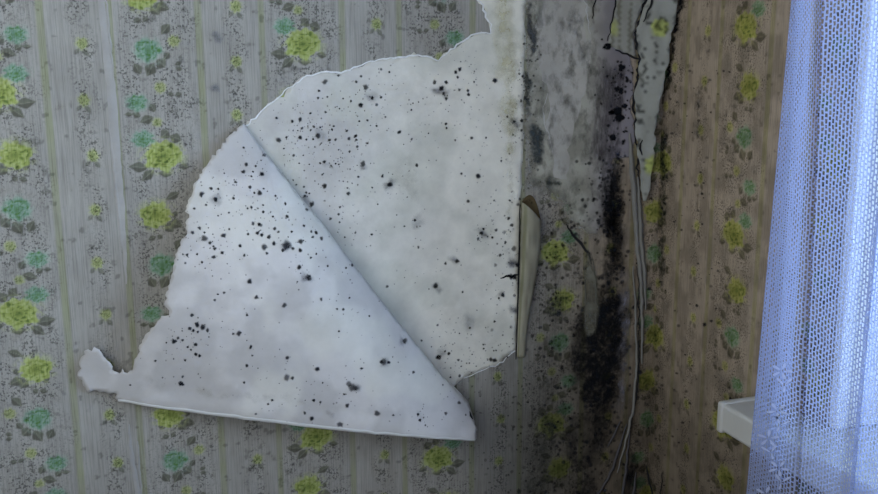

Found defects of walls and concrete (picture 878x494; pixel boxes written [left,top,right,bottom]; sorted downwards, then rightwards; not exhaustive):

mould [166,314,223,361]
mould [187,152,329,290]
mould [276,106,368,188]
peeling [77,0,678,441]
mould [469,215,520,279]
damp [495,3,543,170]
damp [512,61,642,494]
crack [592,0,653,185]
crack [630,266,640,429]
damp [665,0,683,83]
damp [651,124,703,231]